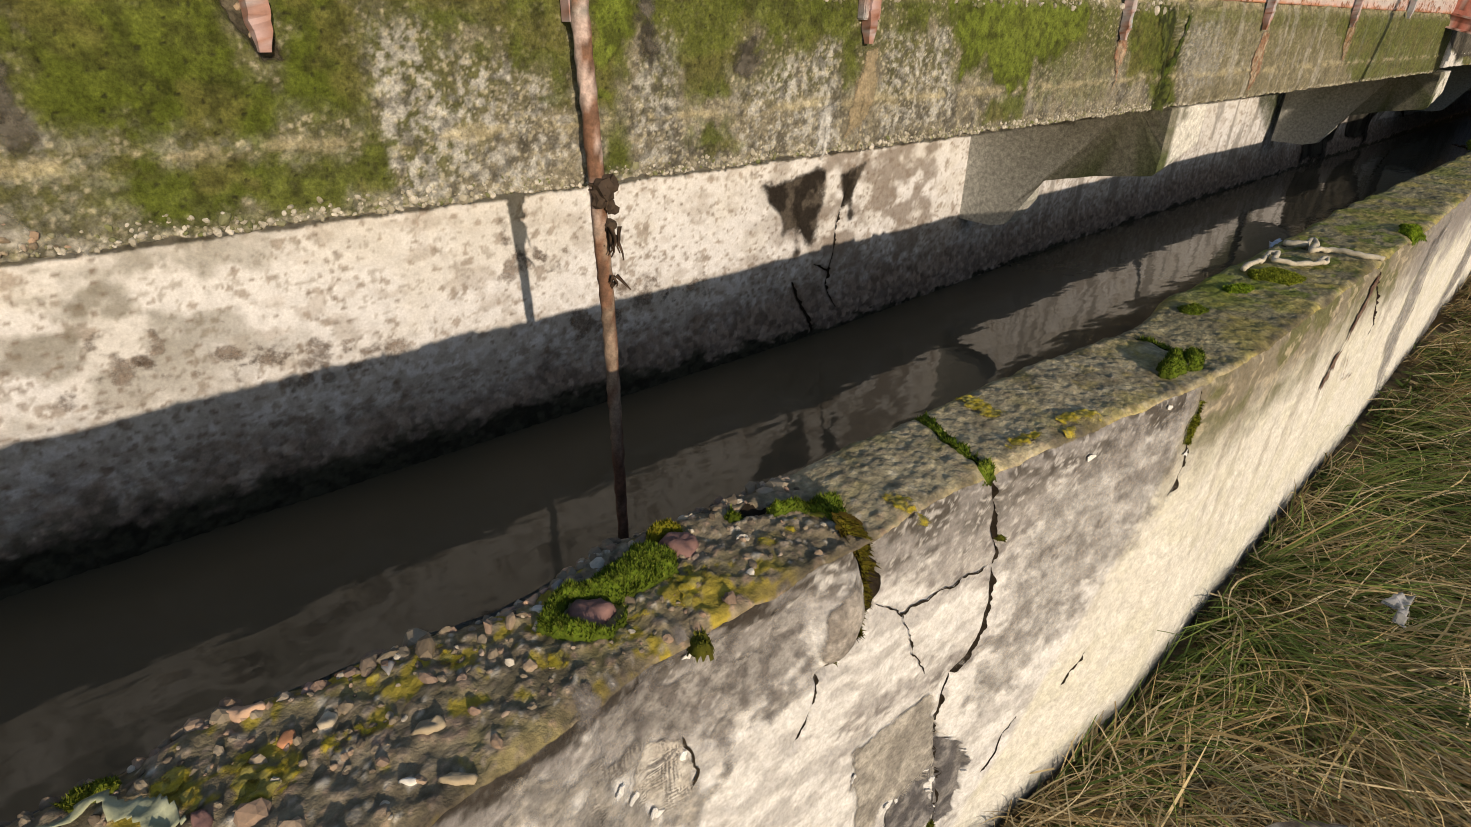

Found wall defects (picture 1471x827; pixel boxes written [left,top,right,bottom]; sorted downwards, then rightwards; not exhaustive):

corrosion [1280,0,1455,14]
corrosion [1337,26,1356,72]
damp [499,238,546,281]
crack [791,178,850,330]
damp [100,331,164,386]
damp [215,338,405,386]
crack [739,504,769,518]
crack [836,416,999,821]
crack [795,664,828,740]
peeling [851,695,971,827]
crack [980,717,1016,772]